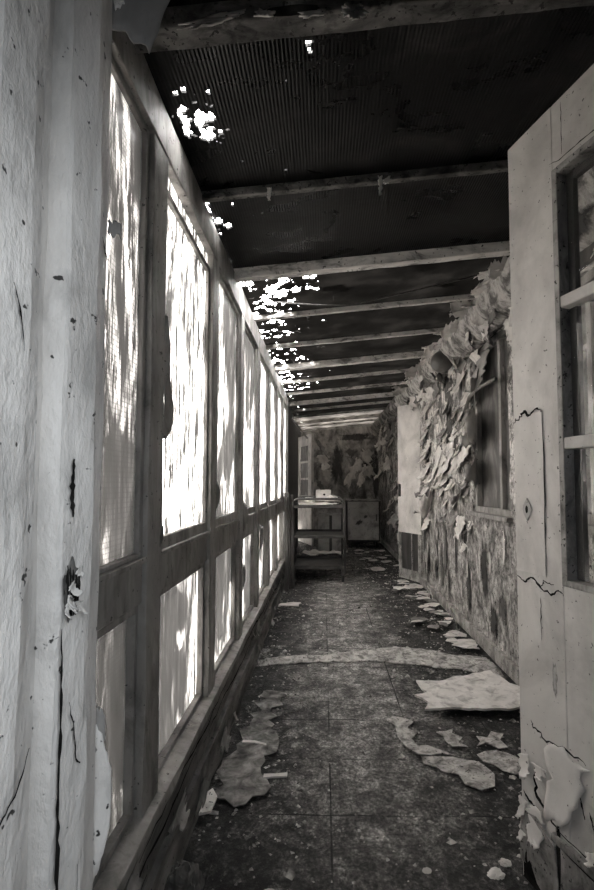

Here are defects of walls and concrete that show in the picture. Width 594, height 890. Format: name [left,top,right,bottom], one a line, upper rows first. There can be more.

peeling [316,440,332,490]
peeling [344,256,512,553]
crack [513,407,563,640]
peeling [515,721,594,850]
peeling [584,852,594,868]